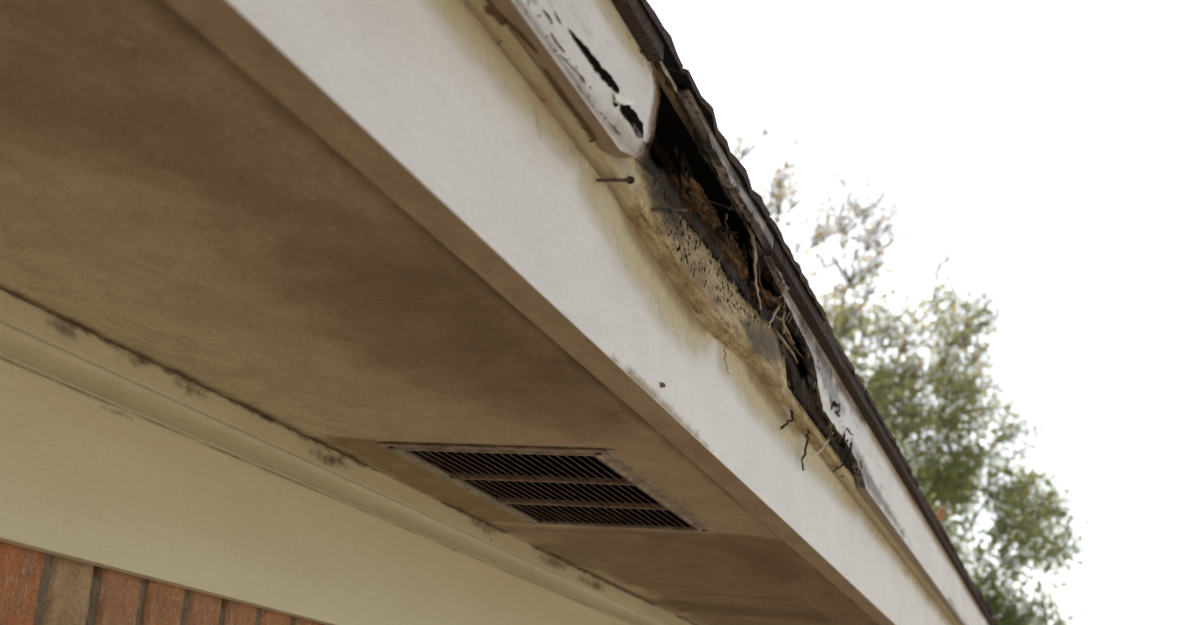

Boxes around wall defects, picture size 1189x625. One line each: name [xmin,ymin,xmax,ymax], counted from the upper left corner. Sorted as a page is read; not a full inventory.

peeling [485,7,508,27]
peeling [528,0,591,93]
damp [605,2,643,58]
peeling [763,255,790,293]
damp [583,72,911,544]